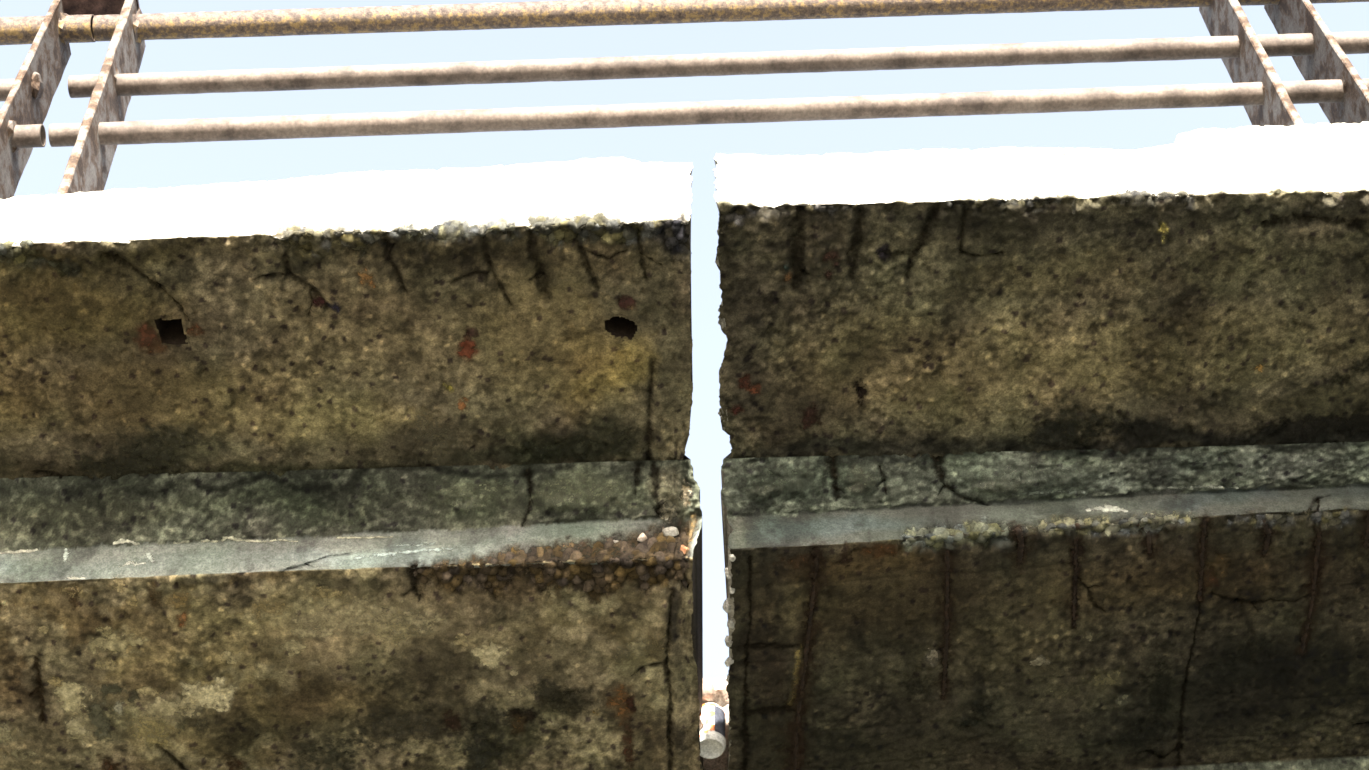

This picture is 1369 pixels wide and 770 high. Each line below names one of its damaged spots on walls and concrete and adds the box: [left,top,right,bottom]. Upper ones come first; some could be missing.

crack [253,228,328,308]
crack [454,227,548,303]
crack [577,236,660,288]
crack [790,206,809,289]
crack [847,204,1002,279]
damp [74,426,197,480]
crack [933,456,988,506]
damp [1024,397,1165,446]
damp [1243,407,1369,443]
spalling [413,485,699,604]
peeling [251,586,446,656]
peeling [453,633,534,697]